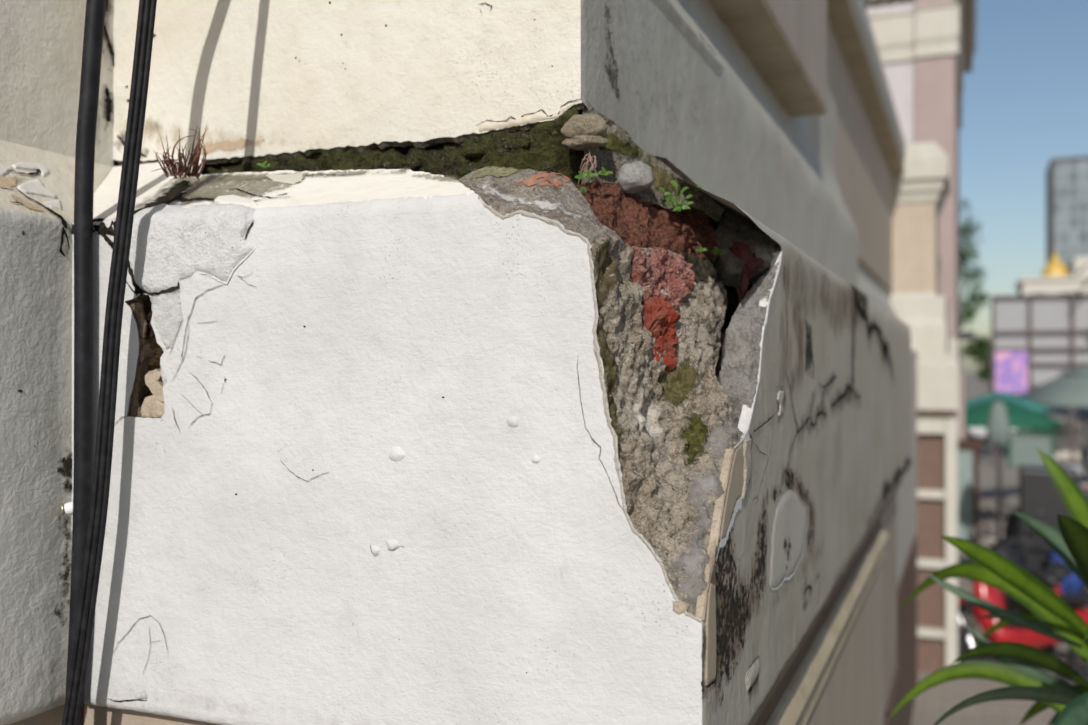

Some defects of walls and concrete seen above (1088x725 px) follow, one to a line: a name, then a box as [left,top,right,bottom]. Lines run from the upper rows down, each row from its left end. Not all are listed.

mould [605,6,620,98]
peeling [0,162,62,212]
crack [170,320,225,432]
spalling [126,99,783,697]
peeling [777,390,785,422]
damp [784,266,860,385]
crack [752,269,896,504]
mould [712,467,815,706]